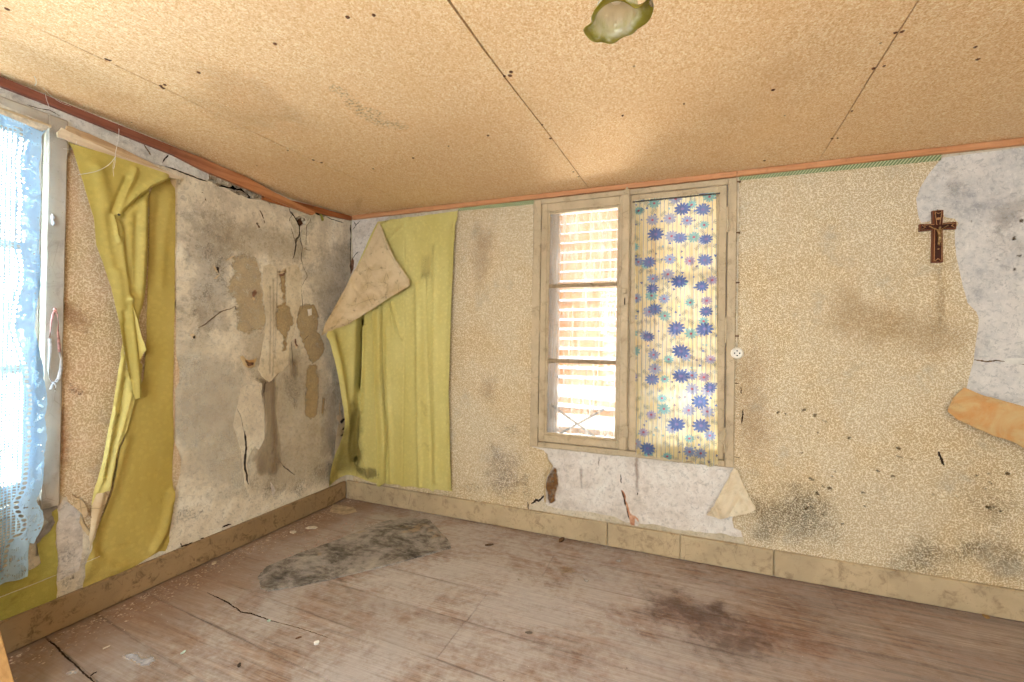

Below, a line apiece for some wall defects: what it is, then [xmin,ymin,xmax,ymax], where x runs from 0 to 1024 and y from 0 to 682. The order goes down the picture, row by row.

flaking render [290,208,320,246]
crack [257,209,360,406]
peeling [350,216,389,273]
peeling [916,147,1024,406]
peeling [233,264,312,496]
crack [237,409,249,484]
peeling [535,447,743,537]
crack [209,593,328,638]